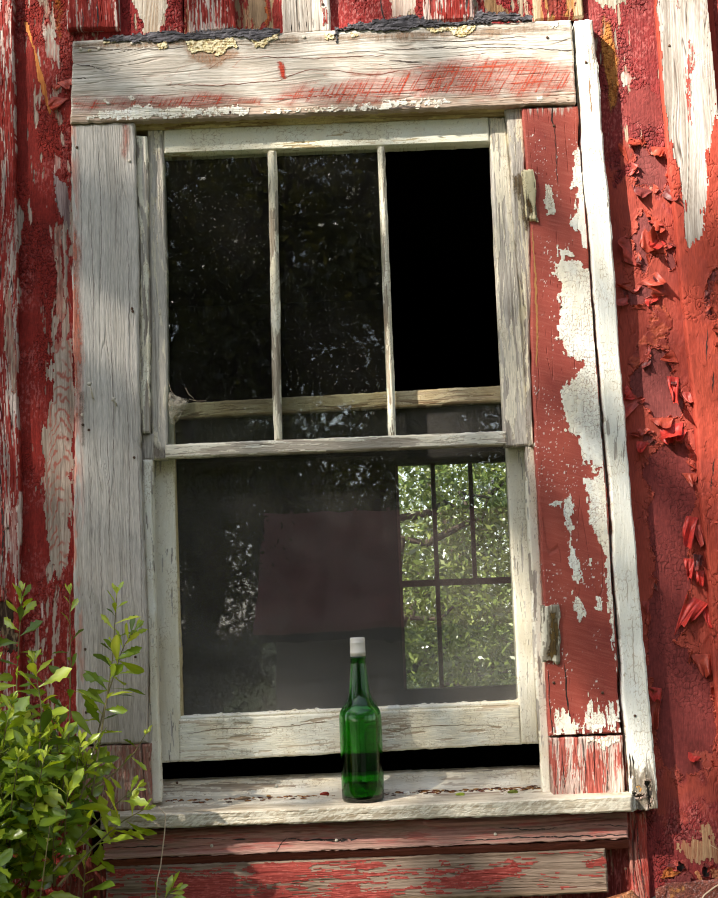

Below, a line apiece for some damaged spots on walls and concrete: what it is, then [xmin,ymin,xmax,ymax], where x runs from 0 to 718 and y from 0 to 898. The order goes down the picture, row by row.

peeling [38,0,60,69]
peeling [132,0,168,35]
peeling [390,0,416,17]
peeling [264,102,377,114]
peeling [410,98,452,109]
peeling [618,0,718,248]
peeling [52,153,71,323]
peeling [616,209,677,309]
peeling [40,338,76,582]
peeling [563,494,575,533]
peeling [622,346,716,781]
crack [277,838,357,850]